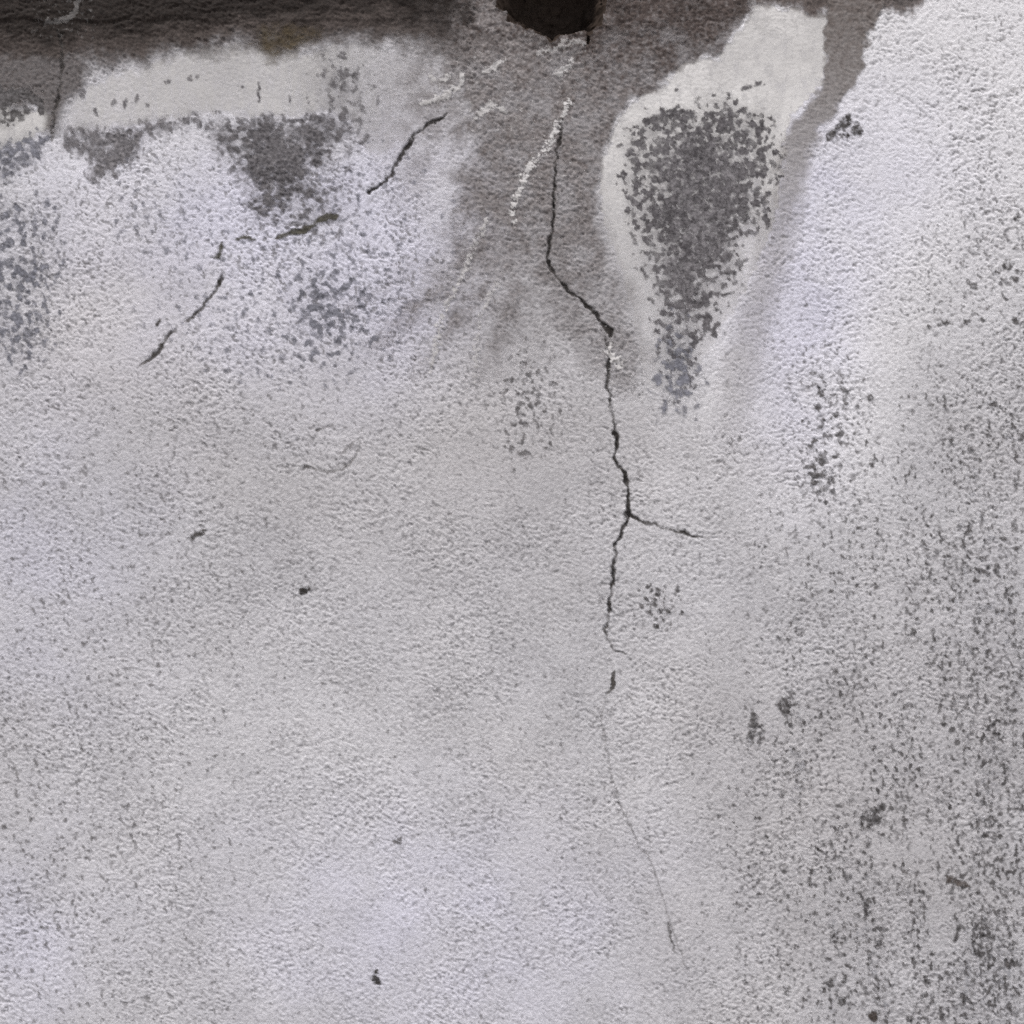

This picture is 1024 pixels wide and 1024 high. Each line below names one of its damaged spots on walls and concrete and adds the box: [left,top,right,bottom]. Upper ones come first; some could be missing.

spalling [495,0,607,44]
crack [368,113,447,195]
damp [0,0,923,413]
crack [142,275,224,364]
damp [964,259,1023,301]
damp [504,362,562,456]
crack [546,123,700,693]
damp [801,372,878,514]
damp [932,385,1024,488]